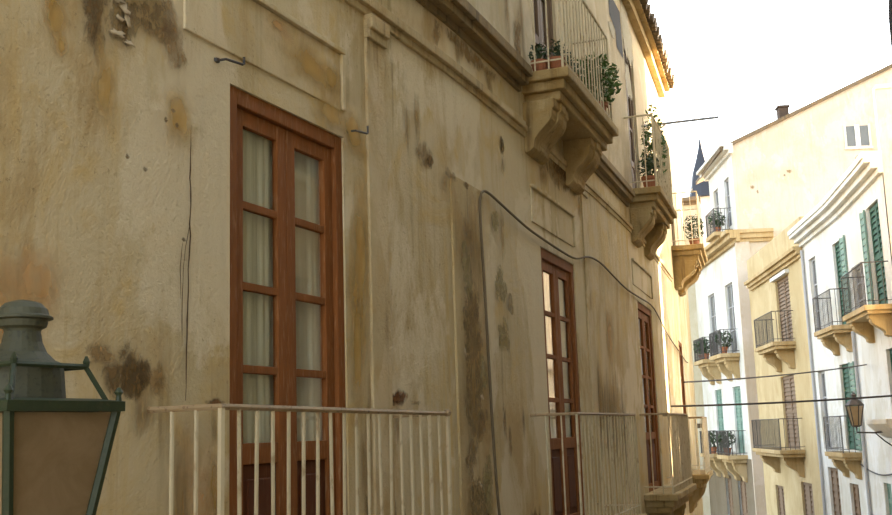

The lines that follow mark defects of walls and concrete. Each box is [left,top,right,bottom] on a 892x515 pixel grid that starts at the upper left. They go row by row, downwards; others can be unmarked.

peeling [83,0,186,68]
peeling [164,97,187,134]
water stain [417,144,434,168]
crack [180,145,191,401]
water stain [90,345,164,424]